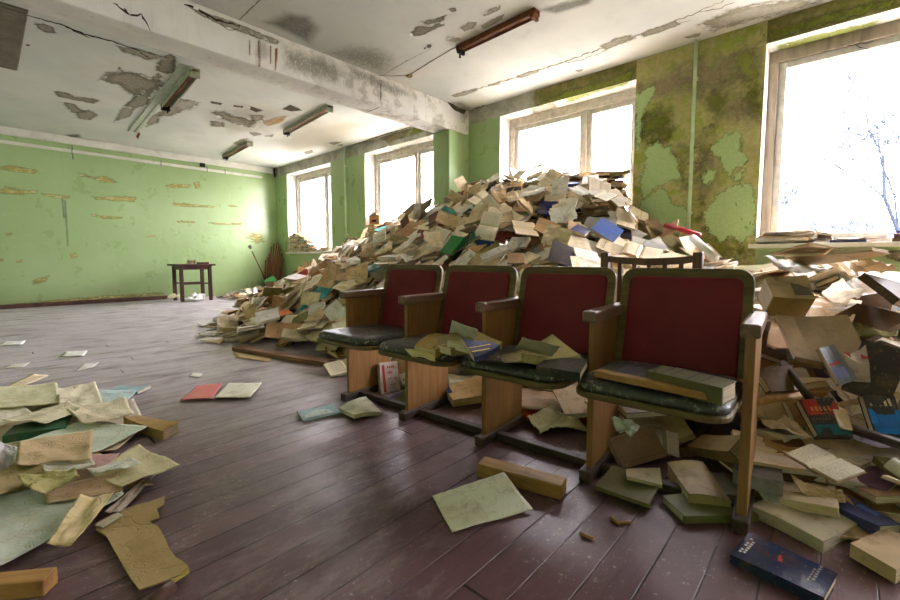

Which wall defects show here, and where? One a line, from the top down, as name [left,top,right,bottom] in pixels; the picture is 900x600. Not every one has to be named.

flaking render [34,23,56,33]
crack [28,3,167,58]
crack [184,0,261,39]
flaking render [410,8,456,36]
flaking render [447,5,504,42]
flaking render [100,46,176,123]
flaking render [54,91,99,121]
flaking render [146,99,198,126]
flaking render [210,101,273,145]